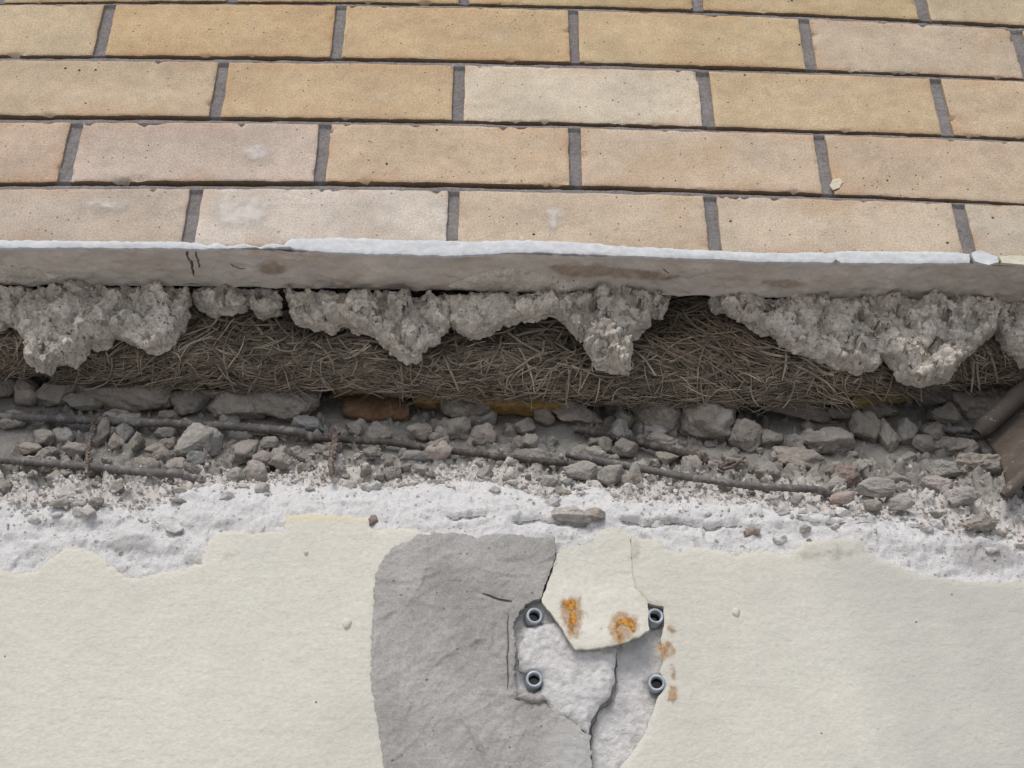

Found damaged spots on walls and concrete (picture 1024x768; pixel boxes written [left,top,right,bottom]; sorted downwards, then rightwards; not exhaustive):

crack [186,251,200,277]
spalling [0,386,1024,768]
rust [562,599,581,633]
rust [611,613,636,642]
rust [657,626,675,658]
crack [590,659,618,760]